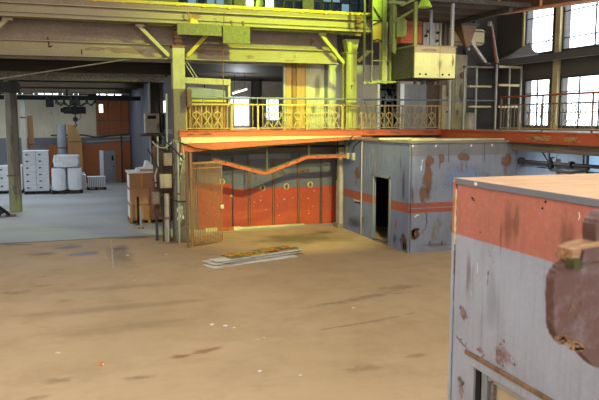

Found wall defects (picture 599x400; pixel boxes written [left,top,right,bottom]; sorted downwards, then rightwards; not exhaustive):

corrosion [419,154,444,202]